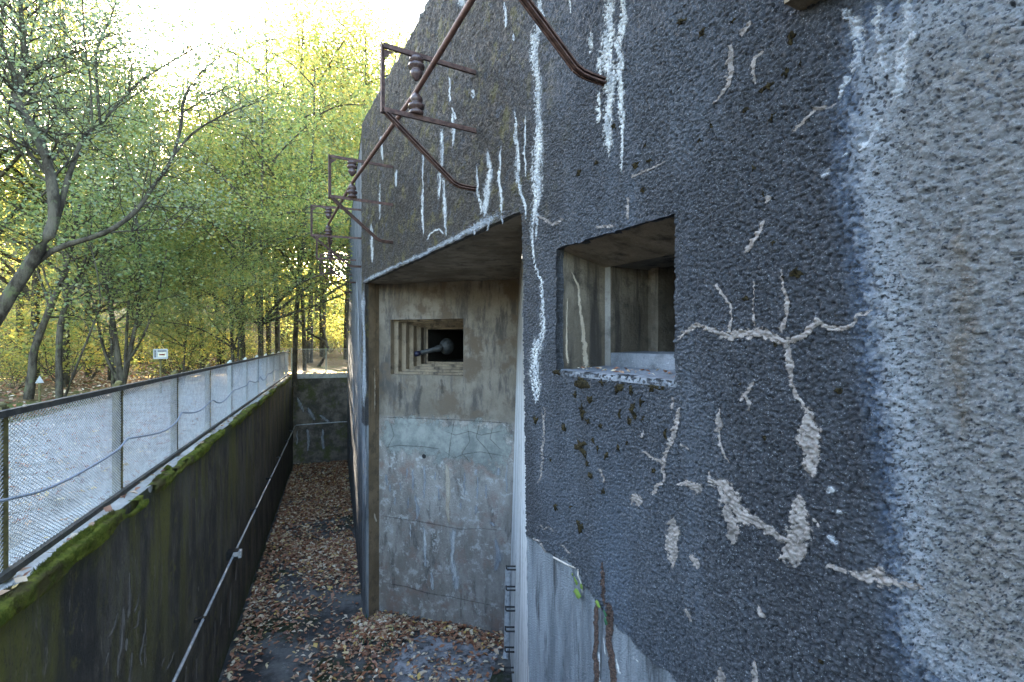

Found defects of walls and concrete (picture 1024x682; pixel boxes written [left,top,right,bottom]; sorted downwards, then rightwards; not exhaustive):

efflorescence [588,0,627,171]
efflorescence [347,0,546,451]
crack [677,269,878,479]
corrosion [592,562,617,682]